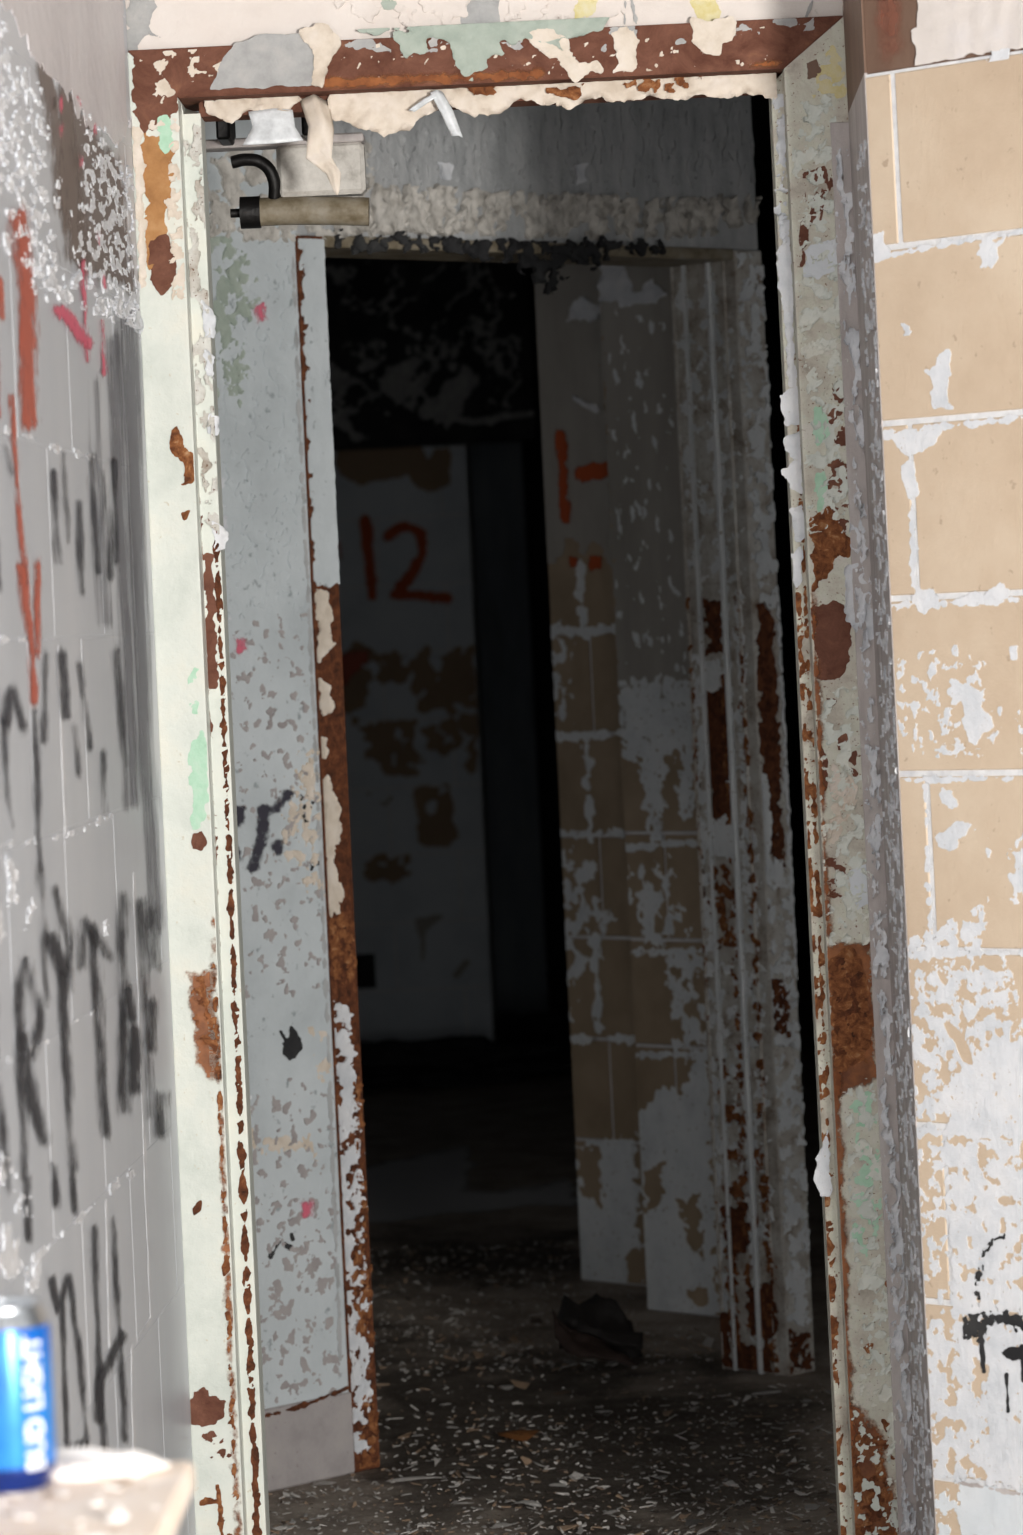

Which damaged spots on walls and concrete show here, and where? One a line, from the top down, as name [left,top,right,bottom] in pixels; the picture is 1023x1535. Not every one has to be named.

rust [131,46,222,133]
peeling [773,17,815,32]
peeling [911,0,1023,66]
rust [148,234,177,296]
rust [169,426,194,486]
peeling [231,641,478,917]
peeling [556,253,833,1326]
rust [181,510,263,1535]
peeling [245,905,322,1000]
rust [685,593,815,1374]
rust [795,387,899,1535]
peeling [250,983,374,1454]